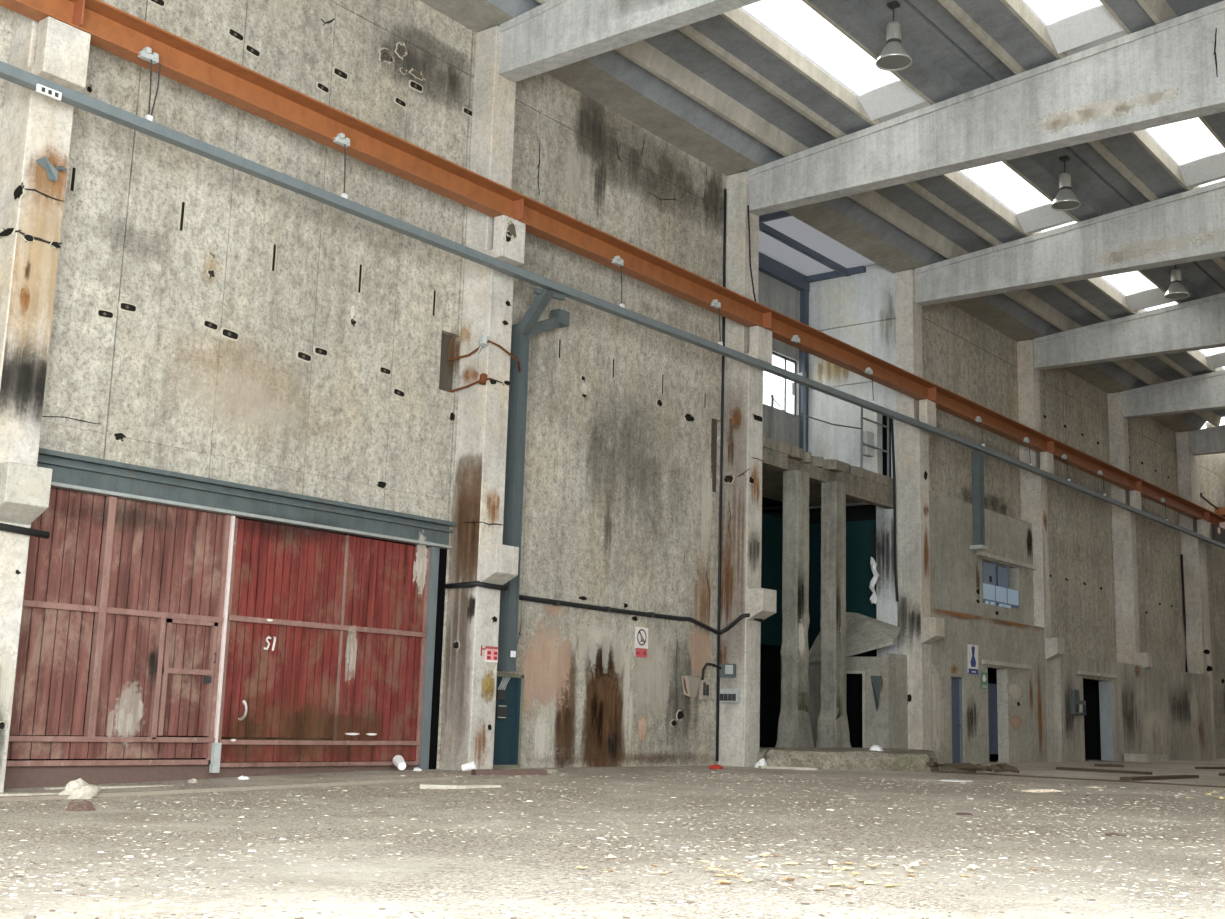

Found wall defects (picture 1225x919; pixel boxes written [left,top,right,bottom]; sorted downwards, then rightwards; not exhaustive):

crack [25,188,65,202]
corrosion [34,152,67,200]
crack [0,228,62,247]
water stain [1,366,47,411]
water stain [555,649,625,768]